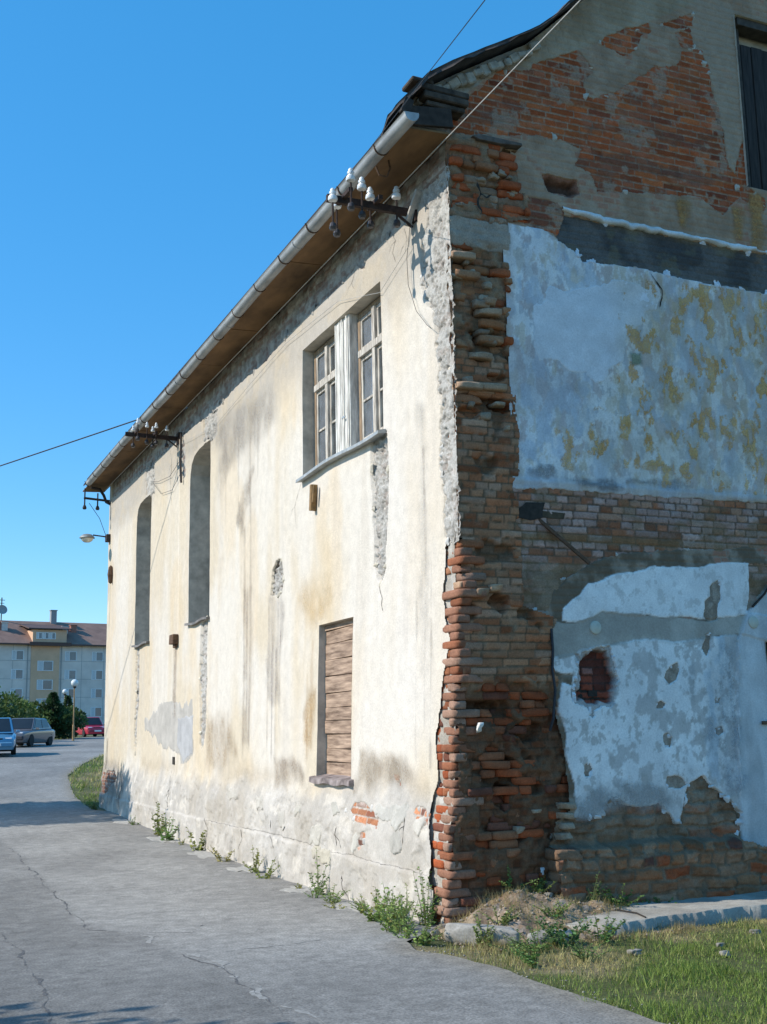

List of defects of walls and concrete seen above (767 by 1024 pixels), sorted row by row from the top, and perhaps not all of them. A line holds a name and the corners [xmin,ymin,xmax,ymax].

flaking render [113,12,767,546]
spalling [370,434,389,587]
flaking render [512,362,767,612]
spalling [273,558,285,598]
spalling [702,580,721,656]
spalling [571,646,618,718]
damp [362,754,407,785]
peeling [331,801,431,854]
spalling [549,775,767,904]